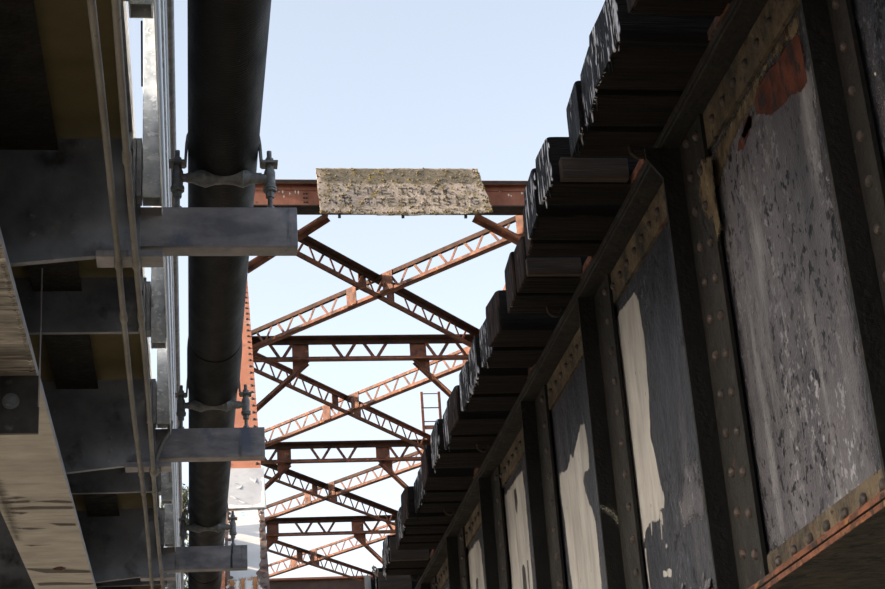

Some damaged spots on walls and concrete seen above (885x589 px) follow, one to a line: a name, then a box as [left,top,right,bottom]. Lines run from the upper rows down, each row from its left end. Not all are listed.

rust [227,576,262,589]
peeling [559,424,602,589]
peeling [616,292,668,589]